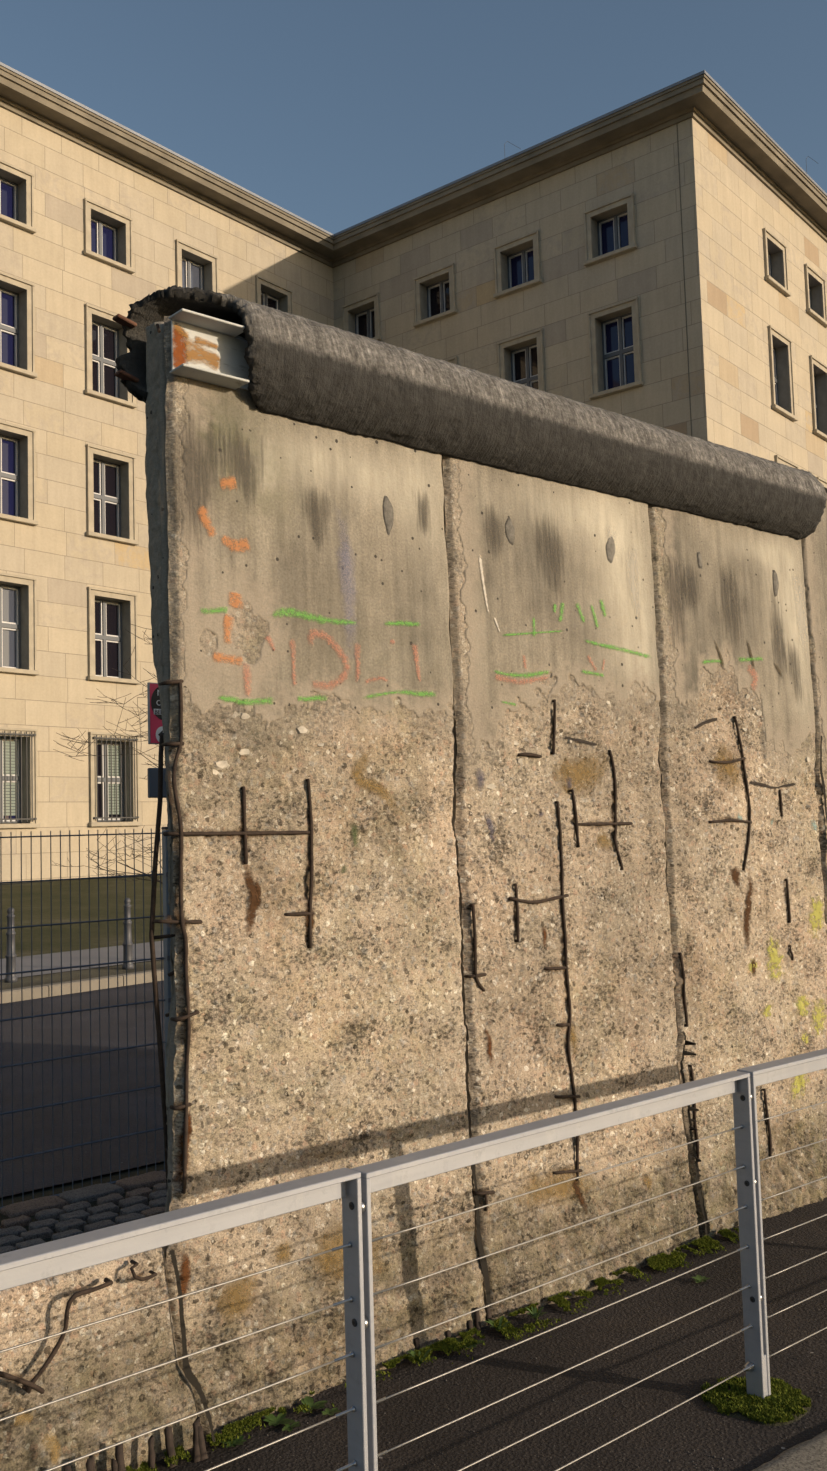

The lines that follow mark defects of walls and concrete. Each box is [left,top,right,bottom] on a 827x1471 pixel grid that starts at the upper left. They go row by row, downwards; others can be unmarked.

corrosion [173,324,220,369]
spalling [149,316,827,1211]
corrosion [245,872,261,932]
corrosion [181,1255,190,1295]
spalling [165,1198,346,1438]
spalling [371,1093,739,1372]